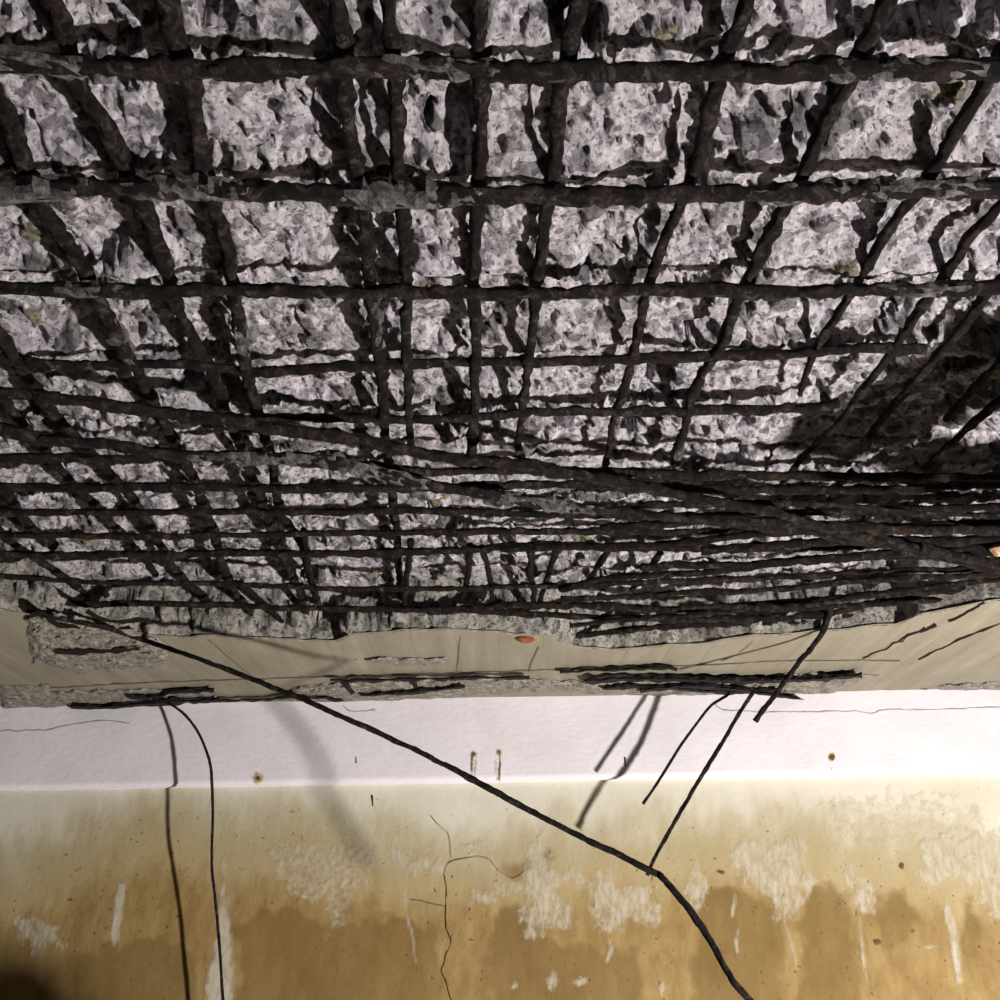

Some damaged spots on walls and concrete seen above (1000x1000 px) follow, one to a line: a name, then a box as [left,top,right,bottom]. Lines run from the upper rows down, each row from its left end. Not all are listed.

spalling [0,0,1000,631]
spalling [0,495,943,1000]
spalling [921,682,1000,691]
crack [410,815,528,1000]
leakage [0,801,1000,1000]